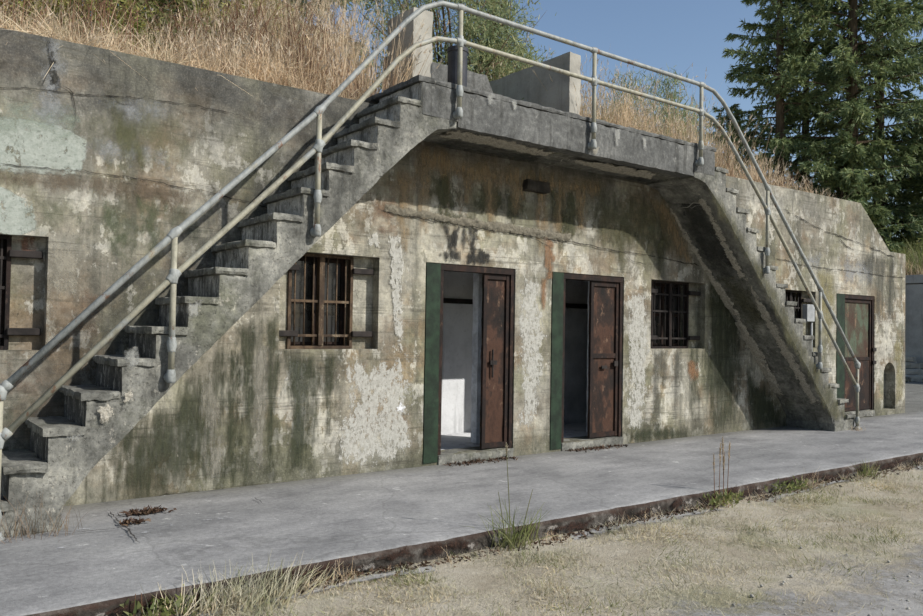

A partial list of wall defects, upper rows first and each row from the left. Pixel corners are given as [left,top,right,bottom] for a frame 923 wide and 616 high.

crack [0,48,244,123]
peeling [0,118,87,176]
peeling [0,187,36,235]
crack [1,163,267,208]
water stain [169,265,198,315]
water stain [197,181,289,266]
water stain [440,224,490,264]
corrosion [541,238,555,308]
water stain [202,323,279,483]
water stain [325,357,335,434]
peeling [338,232,414,470]
peeling [627,294,650,429]